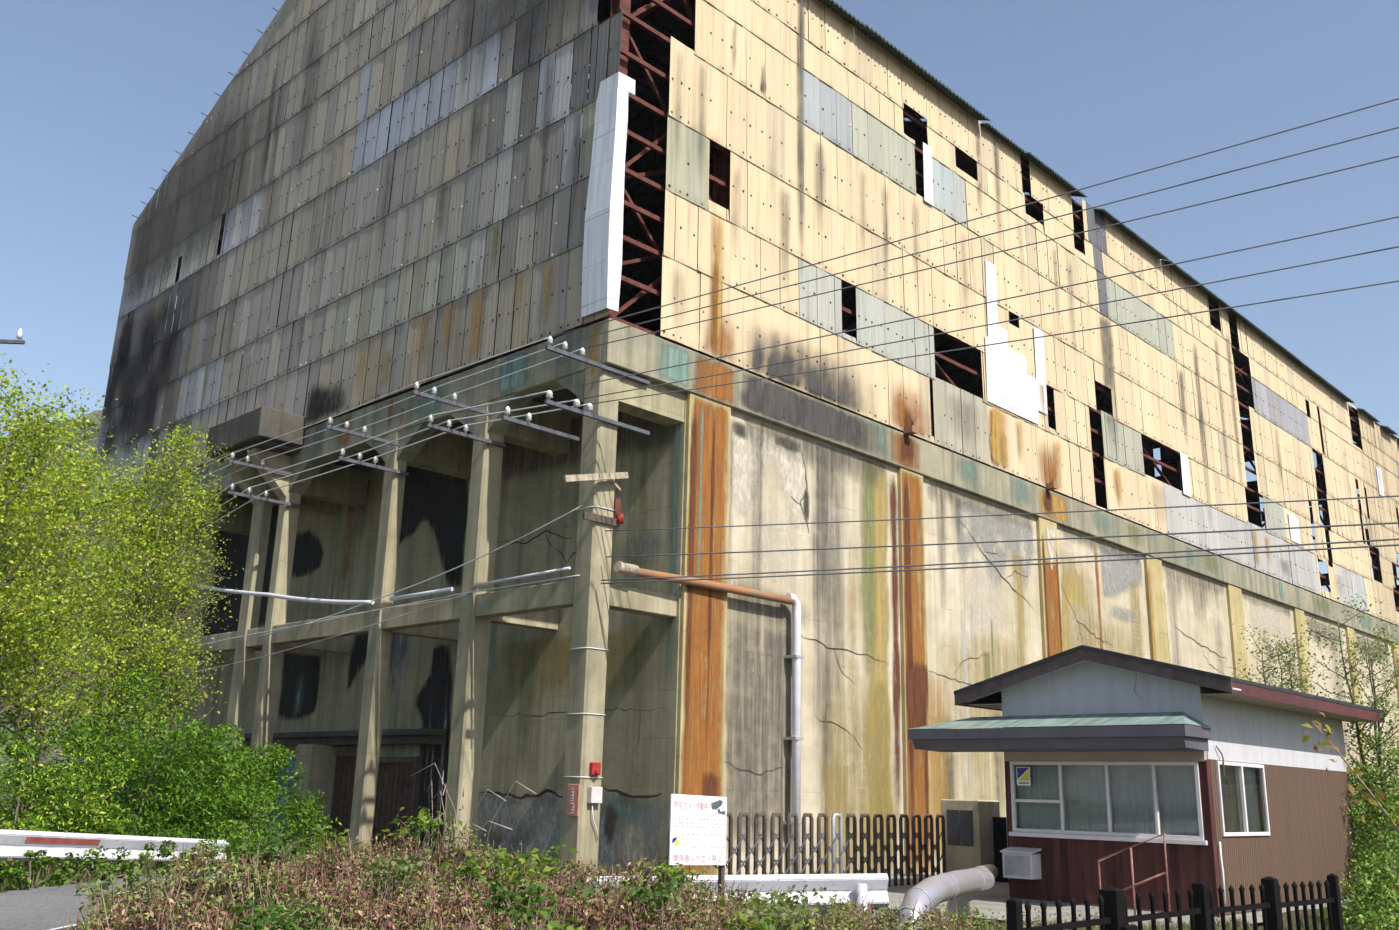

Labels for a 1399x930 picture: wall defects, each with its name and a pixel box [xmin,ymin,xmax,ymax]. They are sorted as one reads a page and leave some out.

water stain [104,303,174,453]
water stain [306,388,342,443]
corrosion [991,407,1022,466]
corrosion [682,223,733,797]
water stain [742,339,883,628]
corrosion [1041,443,1066,522]
corrosion [863,392,948,865]
corrosion [1043,541,1103,657]
peeling [475,793,562,862]
peeling [597,793,662,876]
corrosion [683,865,711,873]